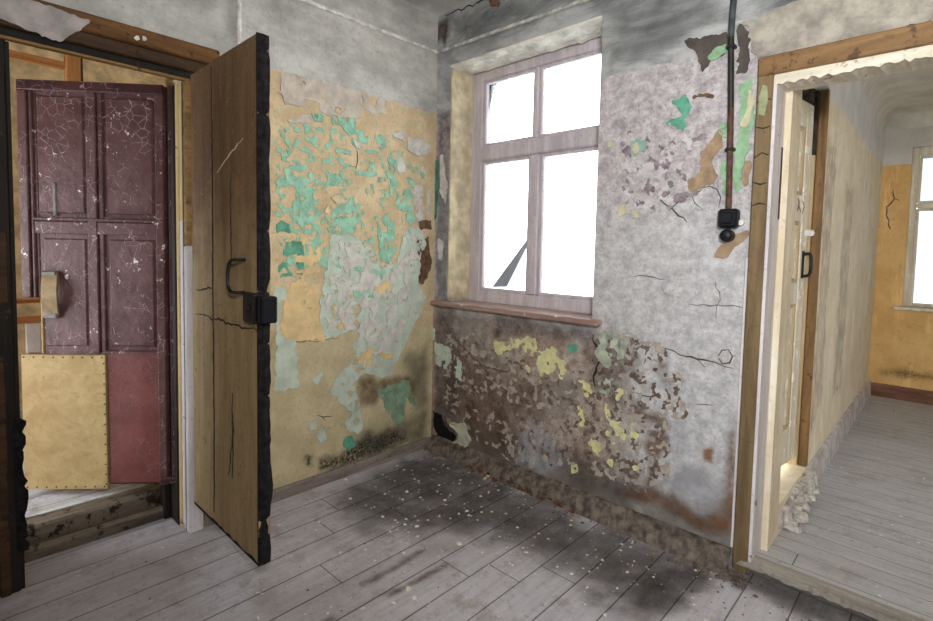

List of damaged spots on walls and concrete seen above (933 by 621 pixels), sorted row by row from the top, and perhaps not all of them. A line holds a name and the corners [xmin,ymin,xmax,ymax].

peeling [0,0,90,42]
flaking render [608,0,933,218]
crack [886,189,899,229]
flaking render [714,230,749,258]
crack [634,275,743,311]
crack [665,348,735,369]
peeling [432,328,688,494]
leakage [308,426,422,470]
leakage [351,461,704,607]